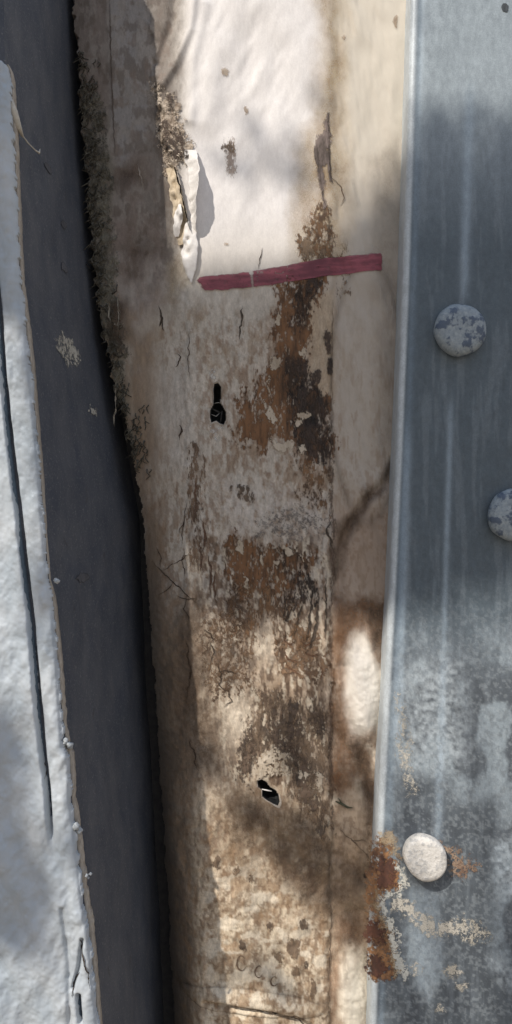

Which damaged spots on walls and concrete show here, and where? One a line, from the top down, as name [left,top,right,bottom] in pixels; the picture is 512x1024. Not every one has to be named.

peeling [149,80,200,283]
crack [314,113,345,209]
peeling [227,275,340,521]
damp [252,480,387,580]
peeling [196,526,333,840]
rust [363,831,497,983]
rust [442,964,469,992]